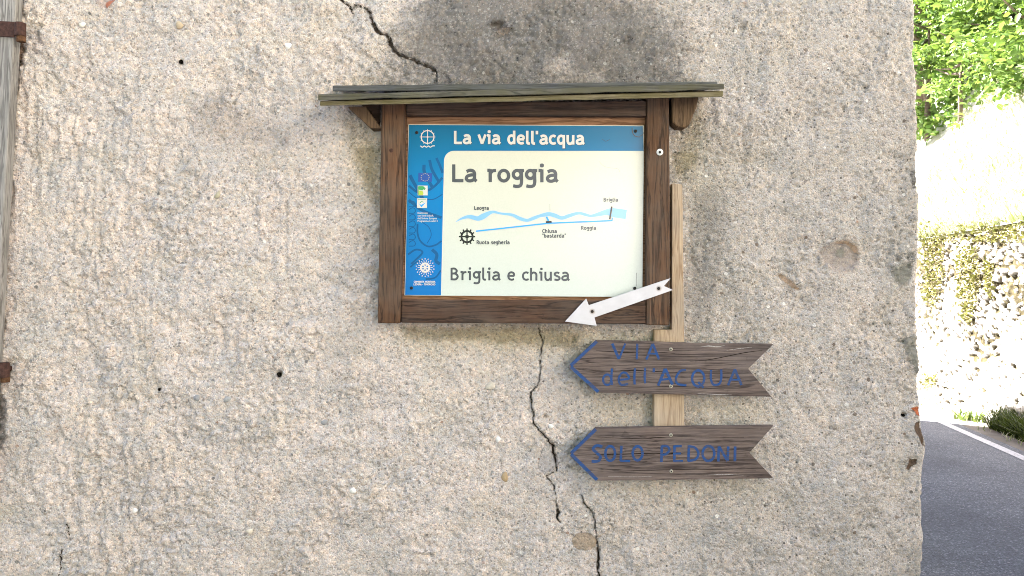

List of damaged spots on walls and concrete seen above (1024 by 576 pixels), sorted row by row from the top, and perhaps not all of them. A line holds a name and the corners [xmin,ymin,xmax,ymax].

crack [340,0,452,82]
crack [530,329,560,522]
crack [581,495,600,576]